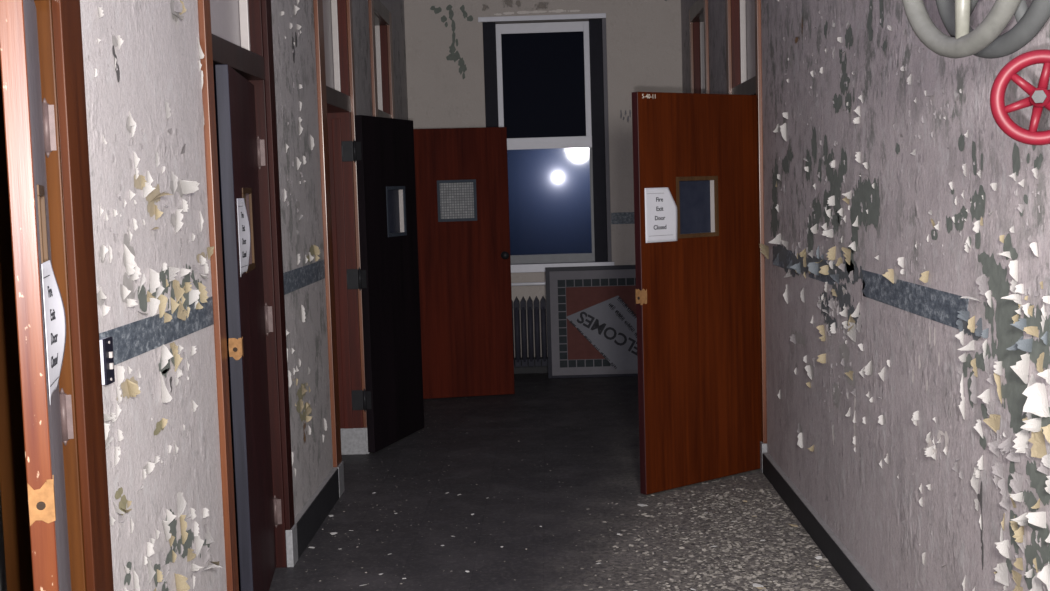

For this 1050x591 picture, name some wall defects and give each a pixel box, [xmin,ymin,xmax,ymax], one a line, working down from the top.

peeling [88,7,124,77]
peeling [171,0,187,22]
peeling [430,4,473,79]
peeling [281,0,314,234]
peeling [97,102,214,323]
peeling [297,245,321,265]
peeling [759,0,890,425]
peeling [883,64,1050,591]
peeling [104,342,198,534]
peeling [287,348,327,442]
peeling [796,422,814,451]
peeling [124,492,222,591]